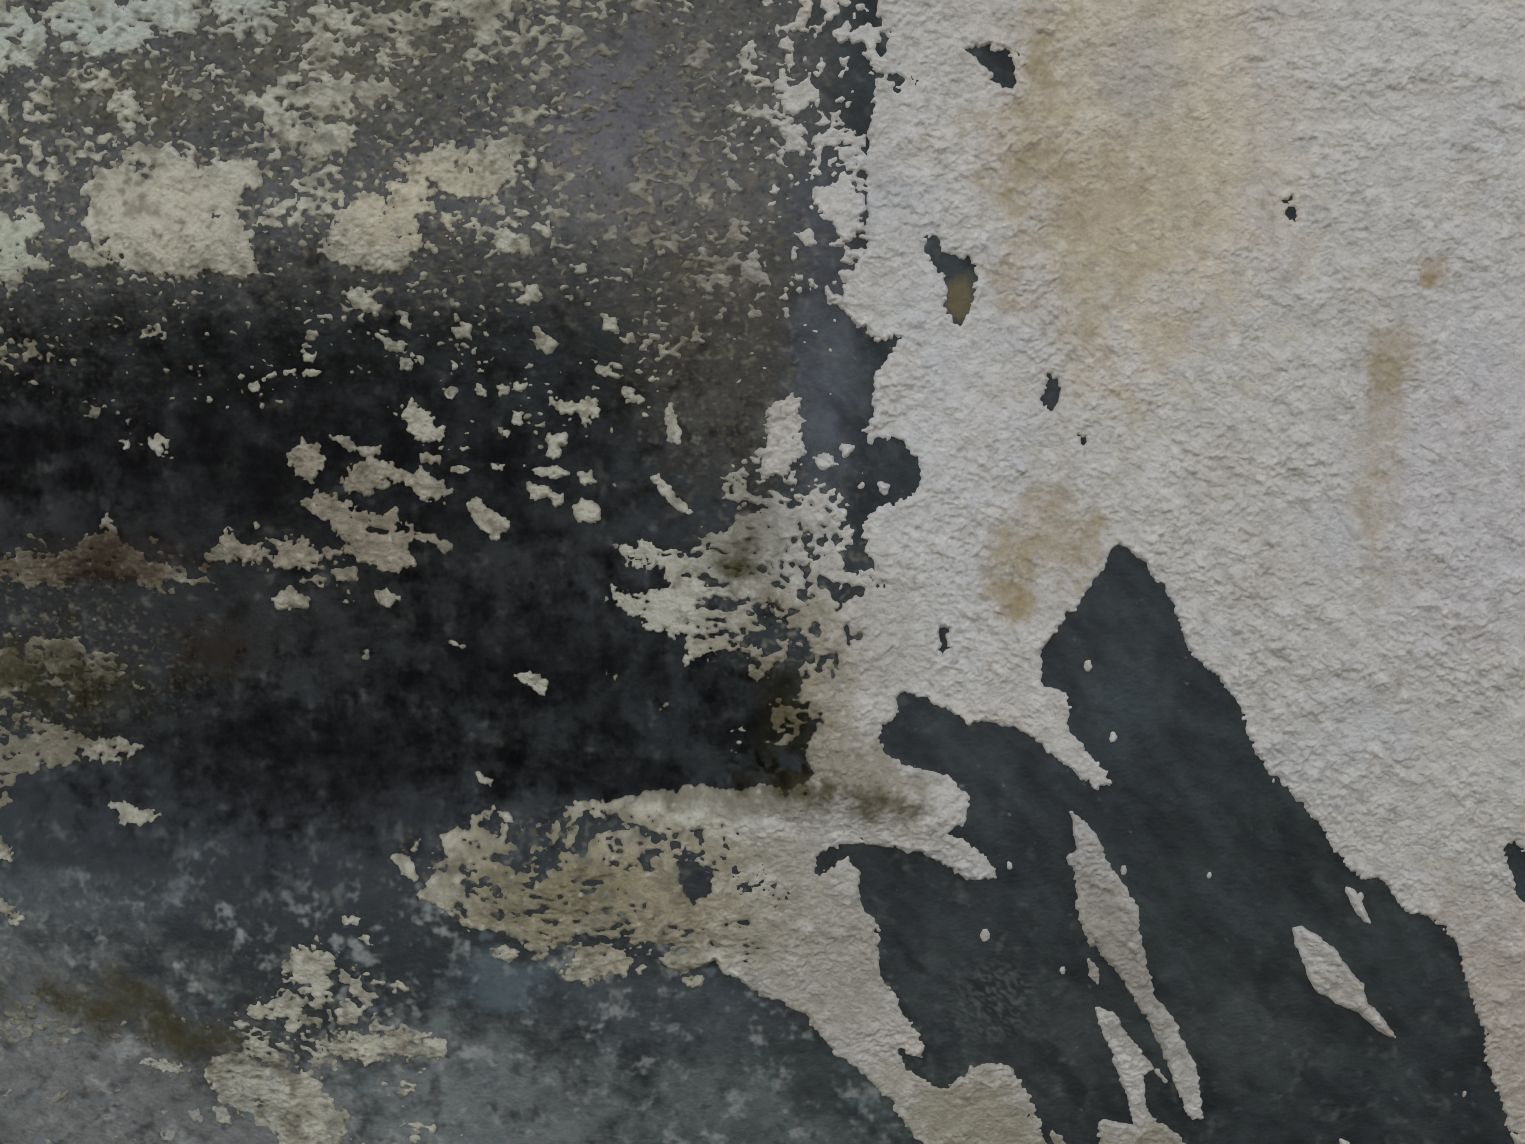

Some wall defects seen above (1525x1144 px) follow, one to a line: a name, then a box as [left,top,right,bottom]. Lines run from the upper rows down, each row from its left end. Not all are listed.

peeling [965,44,1020,88]
peeling [924,235,978,326]
damp [118,315,561,552]
peeling [0,0,923,1144]
damp [388,597,669,740]
damp [686,635,803,753]
damp [177,703,454,837]
damp [530,760,686,803]
damp [774,775,833,798]
flaking render [814,544,1518,1144]
flaking render [1503,841,1525,903]